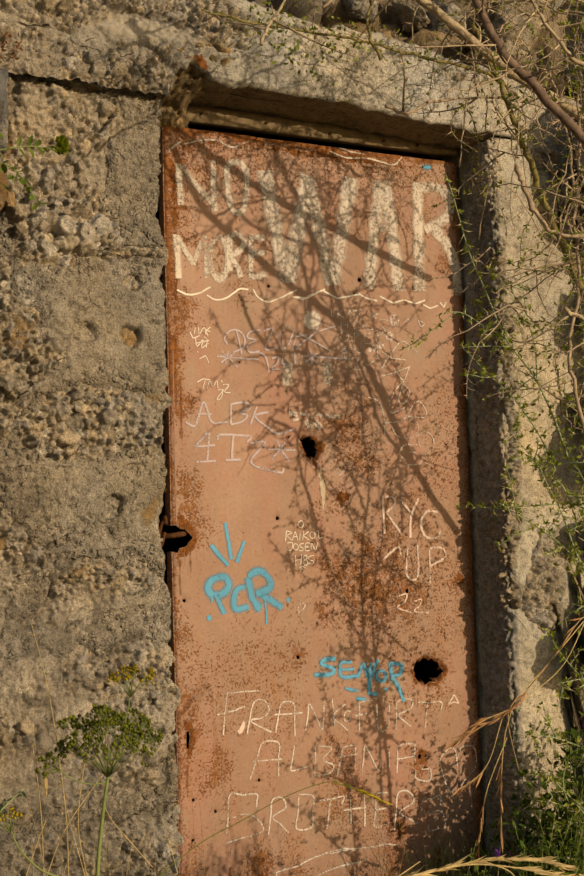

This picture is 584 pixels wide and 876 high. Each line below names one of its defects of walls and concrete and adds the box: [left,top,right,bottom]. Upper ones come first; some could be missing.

rust [169,156,178,229]
rust [175,513,196,567]
rust [341,577,397,615]